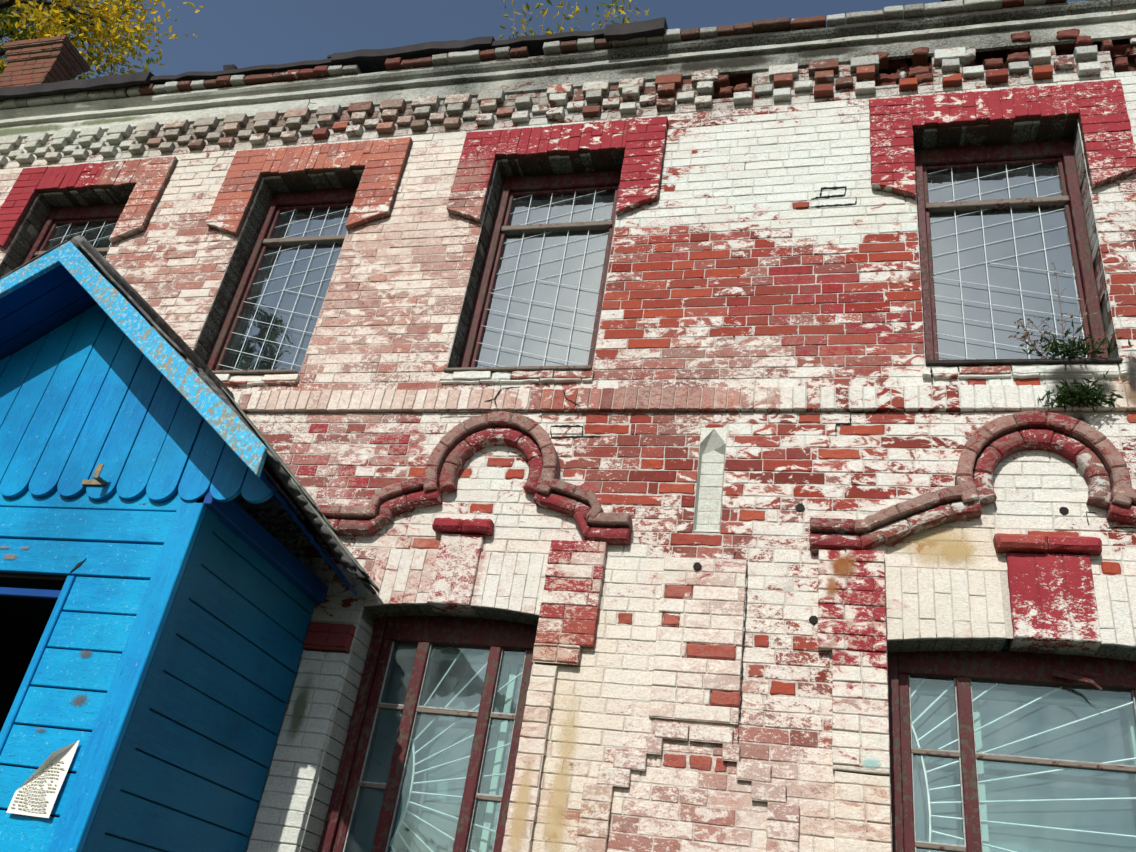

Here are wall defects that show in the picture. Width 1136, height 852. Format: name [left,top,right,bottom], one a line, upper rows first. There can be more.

peeling [595,245,758,359]
peeling [746,285,877,345]
water stain [1127,354,1136,400]
corrosion [828,557,854,595]